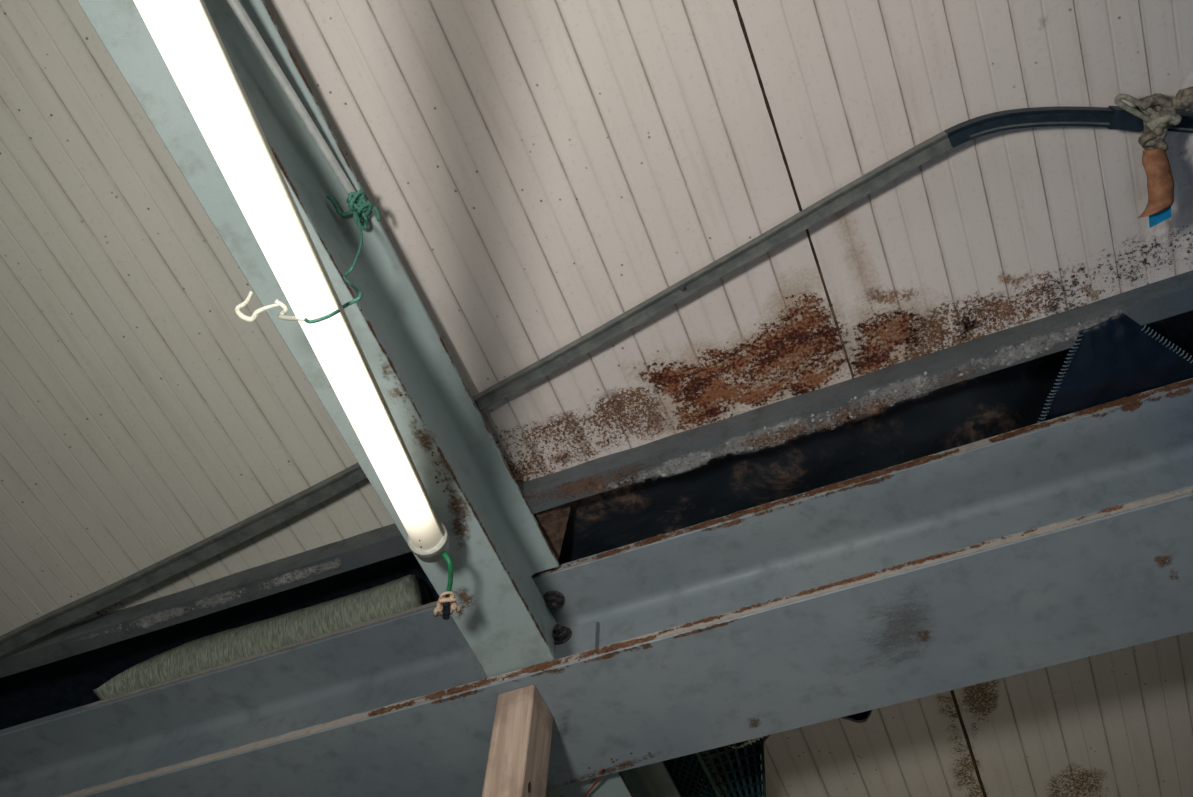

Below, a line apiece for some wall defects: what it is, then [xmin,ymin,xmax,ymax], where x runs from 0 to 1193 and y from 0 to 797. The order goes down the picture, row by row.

rust [268,142,309,217]
leakage [1046,226,1193,317]
rust [318,232,547,643]
rust [440,274,1059,571]
rust [368,537,1006,717]